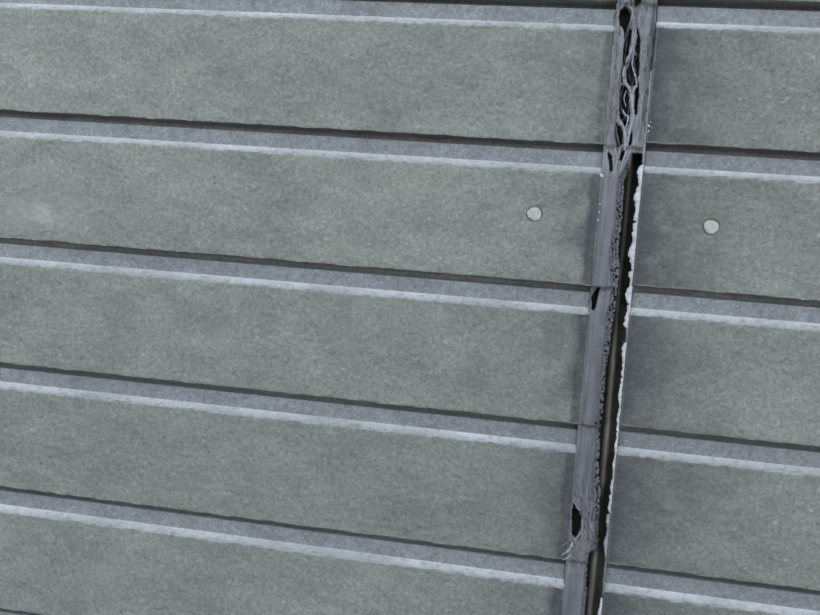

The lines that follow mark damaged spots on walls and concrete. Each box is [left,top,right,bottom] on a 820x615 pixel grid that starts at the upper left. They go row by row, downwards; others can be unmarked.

spalling [559,503,581,560]
crack [581,153,632,615]